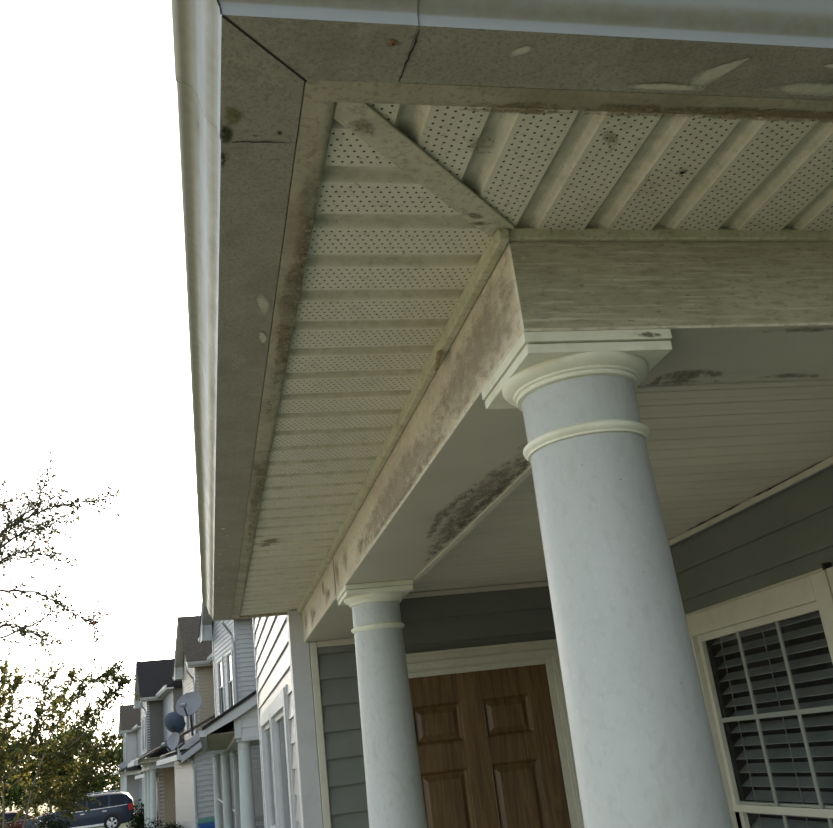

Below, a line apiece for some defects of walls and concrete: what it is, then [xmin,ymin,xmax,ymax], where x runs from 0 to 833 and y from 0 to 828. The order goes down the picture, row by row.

crack [399,29,420,81]
peeling [629,58,750,91]
peeling [778,83,833,95]
leakage [221,109,240,143]
crack [232,138,294,146]
leakage [361,280,511,547]
leakage [426,459,527,557]